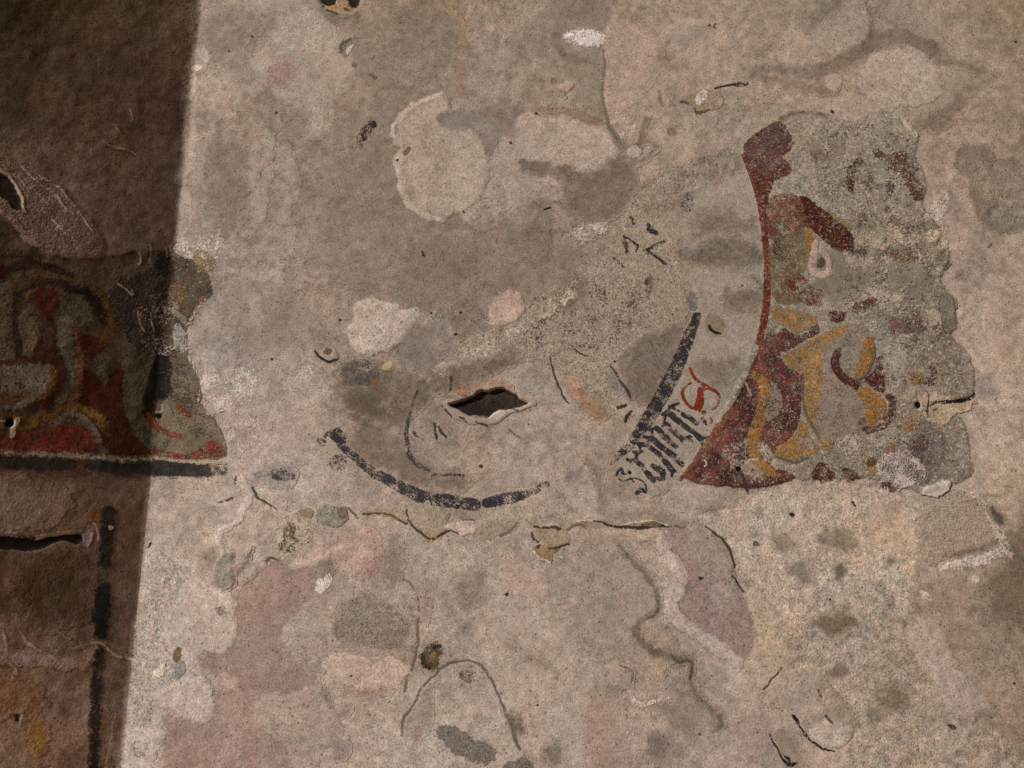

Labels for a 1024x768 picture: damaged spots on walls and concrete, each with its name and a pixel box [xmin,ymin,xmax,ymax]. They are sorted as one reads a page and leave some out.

damp [437,0,662,228]
peeling [0,156,106,259]
damp [172,0,557,463]
spalling [338,149,745,427]
peeling [9,417,20,439]
spalling [915,391,978,427]
crack [400,579,528,750]
crack [762,664,855,768]